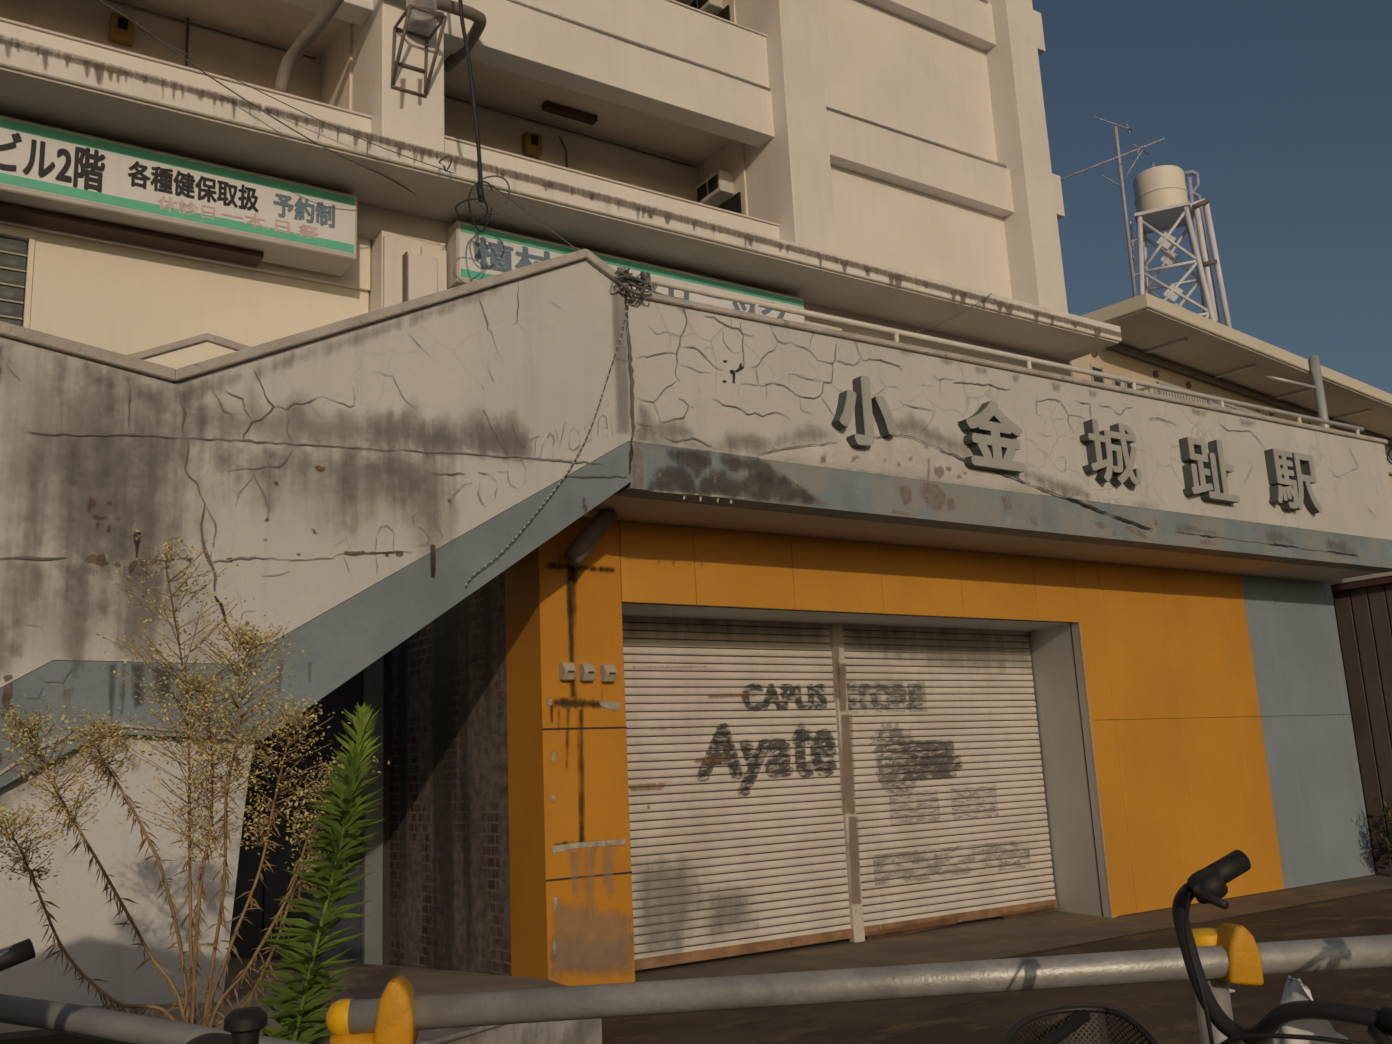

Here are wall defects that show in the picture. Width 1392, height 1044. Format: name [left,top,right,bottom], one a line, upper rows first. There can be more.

damp [0,35,1122,342]
crack [27,286,1357,649]
damp [648,440,815,503]
peeling [893,483,955,514]
crack [0,554,67,562]